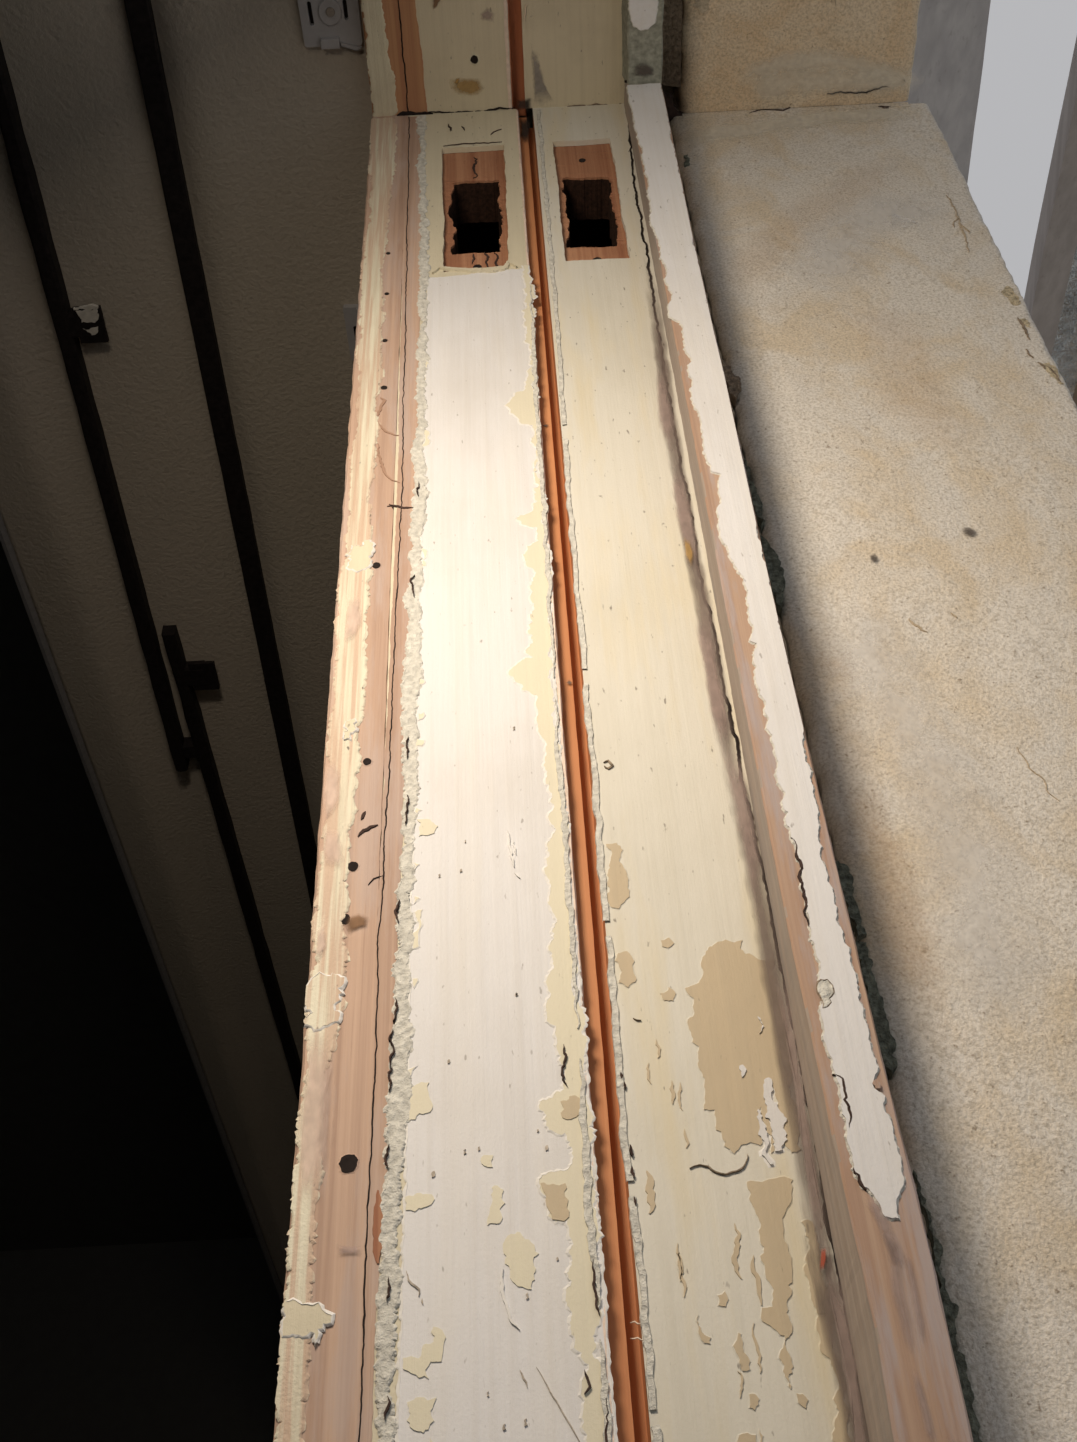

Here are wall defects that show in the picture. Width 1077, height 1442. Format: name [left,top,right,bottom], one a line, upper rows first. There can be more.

peeling [273,0,619,1442]
peeling [605,843,631,910]
peeling [614,951,637,989]
peeling [660,939,863,1442]
peeling [626,83,906,1222]